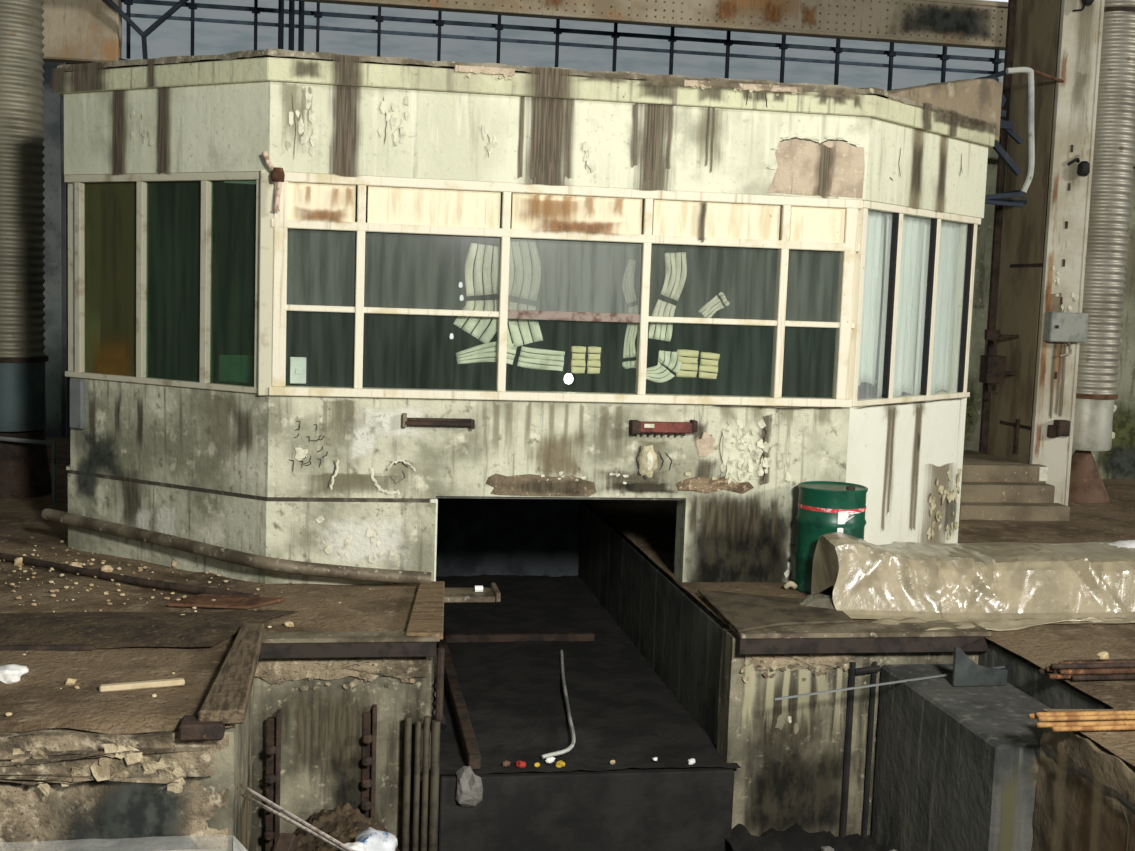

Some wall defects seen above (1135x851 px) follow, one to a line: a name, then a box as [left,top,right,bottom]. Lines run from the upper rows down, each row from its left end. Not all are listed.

damp [296,61,318,76]
peeling [286,91,316,156]
damp [330,54,361,177]
damp [518,67,574,186]
damp [631,82,673,191]
peeling [767,135,865,198]
rust [533,194,623,234]
damp [77,402,176,536]
damp [236,413,251,447]
spalling [485,471,596,497]
peeling [676,414,791,494]
spalling [0,657,429,851]